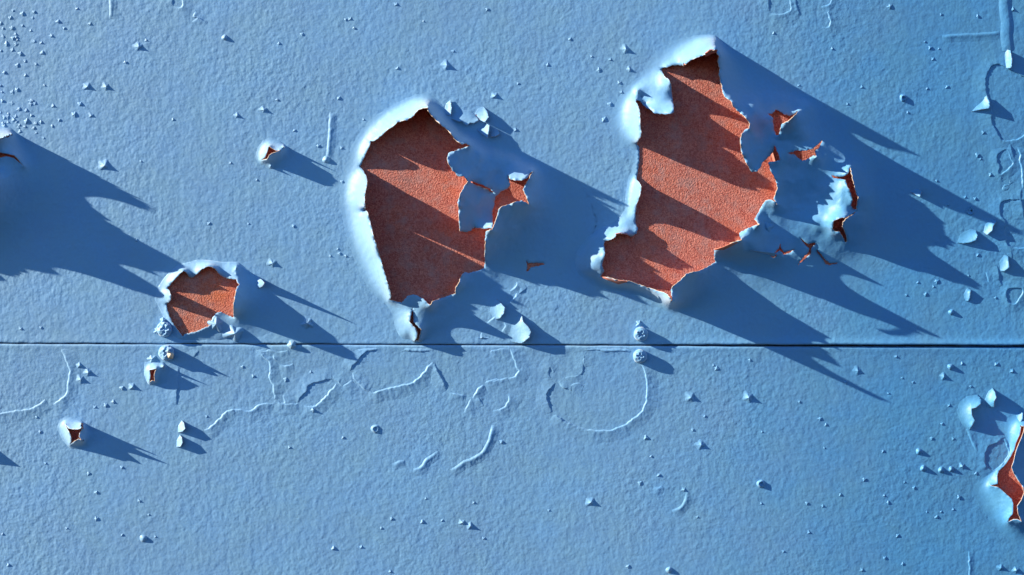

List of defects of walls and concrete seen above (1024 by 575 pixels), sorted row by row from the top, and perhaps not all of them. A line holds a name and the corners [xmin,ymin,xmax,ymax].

peeling [0,125,52,279]
peeling [255,137,295,169]
peeling [338,35,890,343]
peeling [155,259,284,340]
peeling [144,348,171,386]
peeling [57,416,94,450]
peeling [957,388,1024,550]